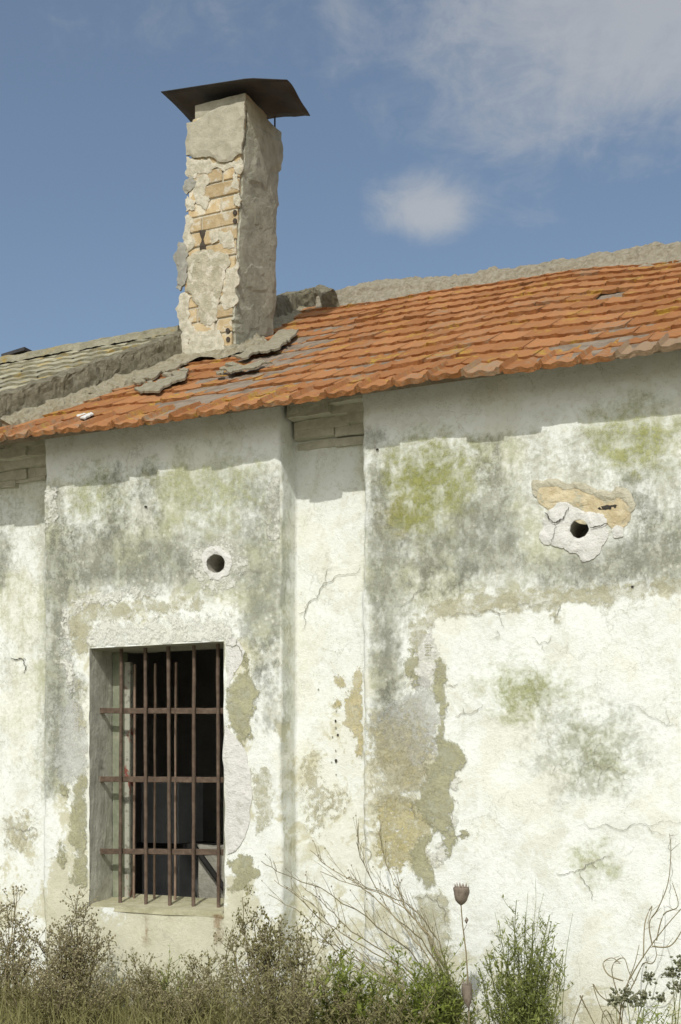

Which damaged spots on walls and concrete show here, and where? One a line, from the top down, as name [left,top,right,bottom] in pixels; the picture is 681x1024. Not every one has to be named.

peeling [173,242,299,375]
spalling [133,362,189,394]
water stain [44,486,59,529]
spalling [531,478,636,538]
water stain [86,611,234,646]
crack [299,569,360,628]
water stain [368,574,675,771]
peeling [223,636,272,894]
peeling [300,644,469,956]